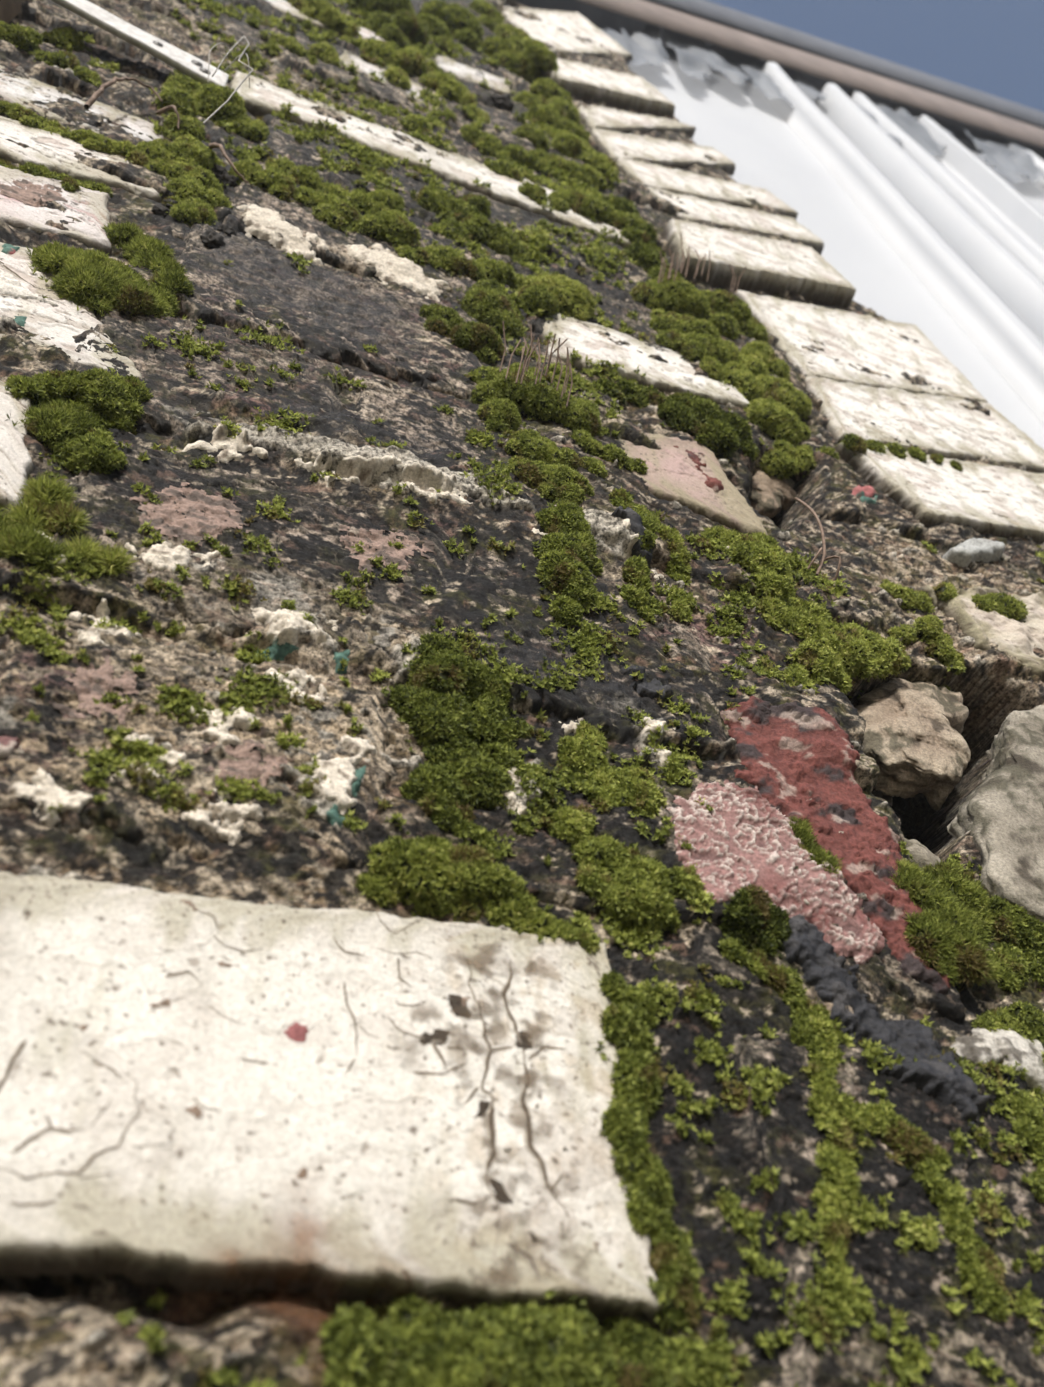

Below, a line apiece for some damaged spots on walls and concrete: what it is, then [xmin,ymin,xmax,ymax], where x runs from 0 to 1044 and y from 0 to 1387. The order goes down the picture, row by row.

peeling [0,179,68,207]
peeling [0,244,59,307]
peeling [14,316,27,327]
crack [198,910,264,953]
crack [149,970,246,1025]
crack [240,1057,268,1065]
crack [273,900,577,1288]
crack [0,1050,165,1207]